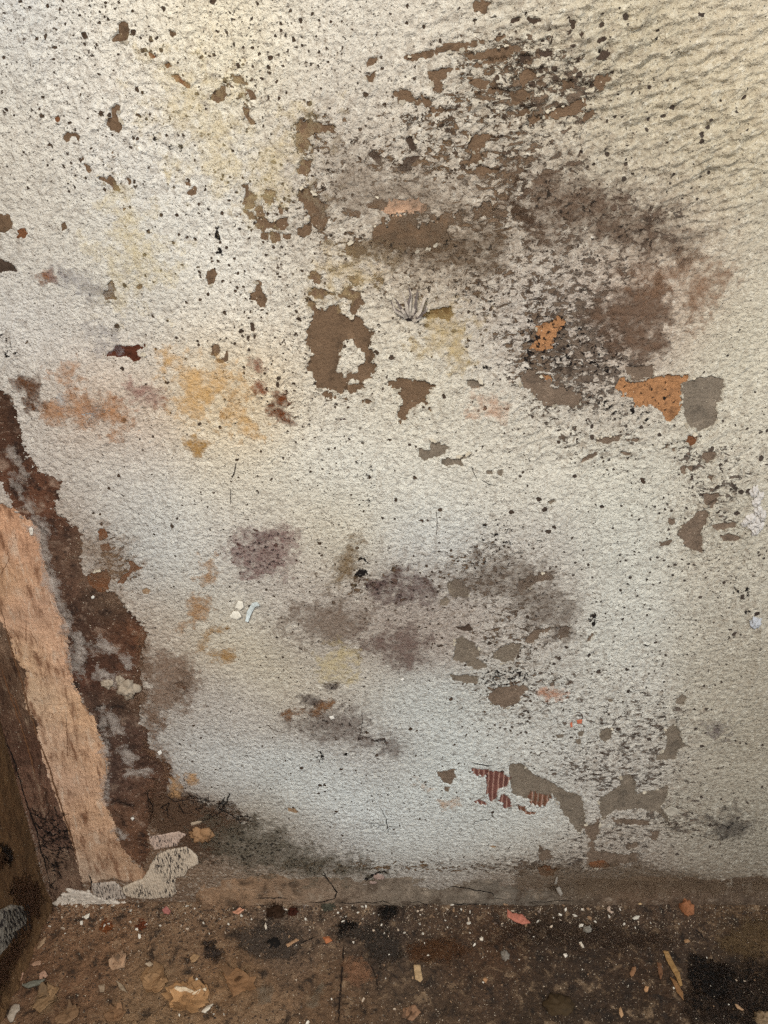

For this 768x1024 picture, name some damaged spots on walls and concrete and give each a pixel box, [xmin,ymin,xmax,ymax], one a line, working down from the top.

peeling [393,34,595,136]
peeling [236,116,335,243]
leakage [512,172,688,265]
peeling [305,271,377,404]
leakage [429,280,674,376]
peeling [387,377,436,424]
leakage [587,381,679,426]
peeling [614,364,740,554]
leakage [336,536,437,605]
leakage [0,390,369,888]
leakage [290,605,433,690]
peeling [471,763,678,870]